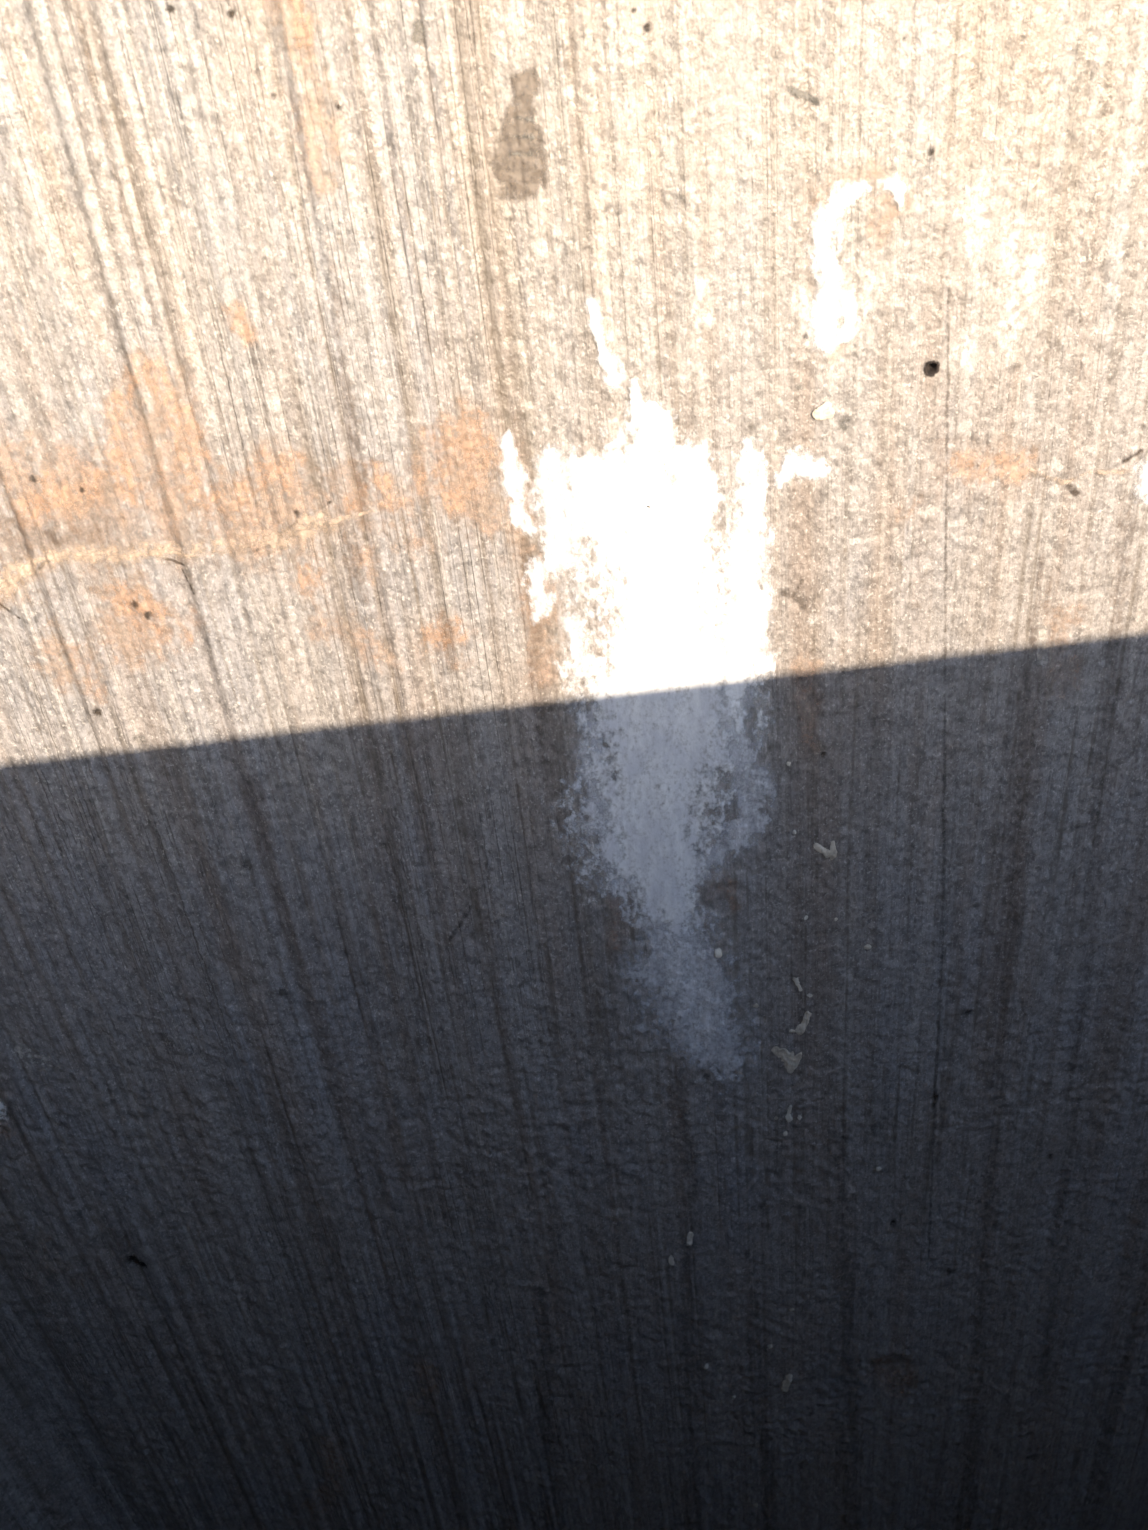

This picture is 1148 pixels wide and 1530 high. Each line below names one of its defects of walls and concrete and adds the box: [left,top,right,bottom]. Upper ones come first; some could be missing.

damp [791,174,906,370]
crack [0,501,374,619]
damp [501,299,830,1080]